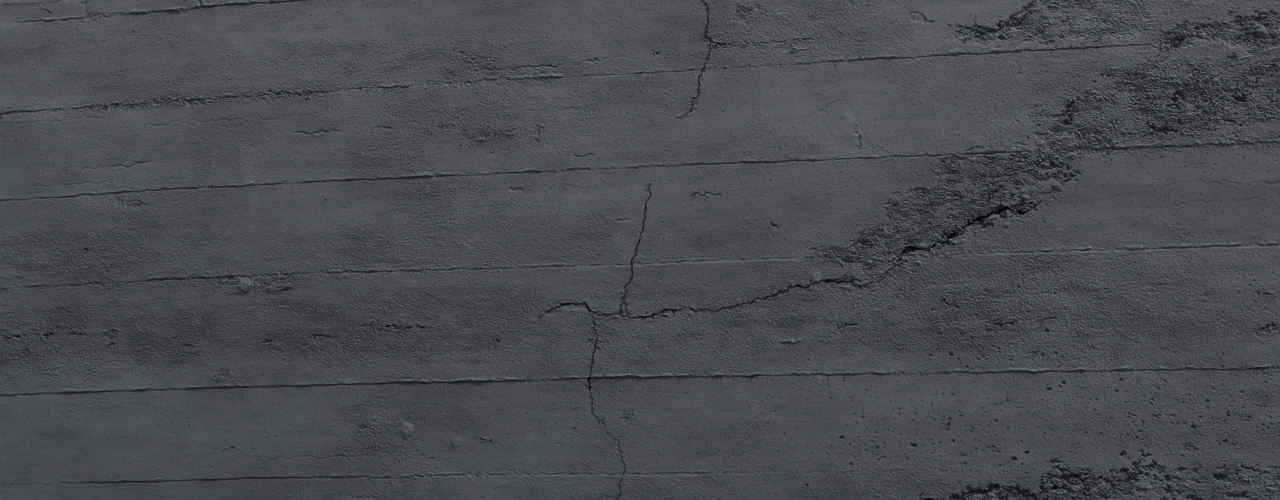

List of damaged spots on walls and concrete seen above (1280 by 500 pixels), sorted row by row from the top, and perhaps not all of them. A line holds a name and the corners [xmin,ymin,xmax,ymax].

crack [675,0,712,119]
spalling [922,0,1280,60]
spalling [808,102,1122,283]
crack [536,183,1042,500]
spalling [949,484,1041,500]